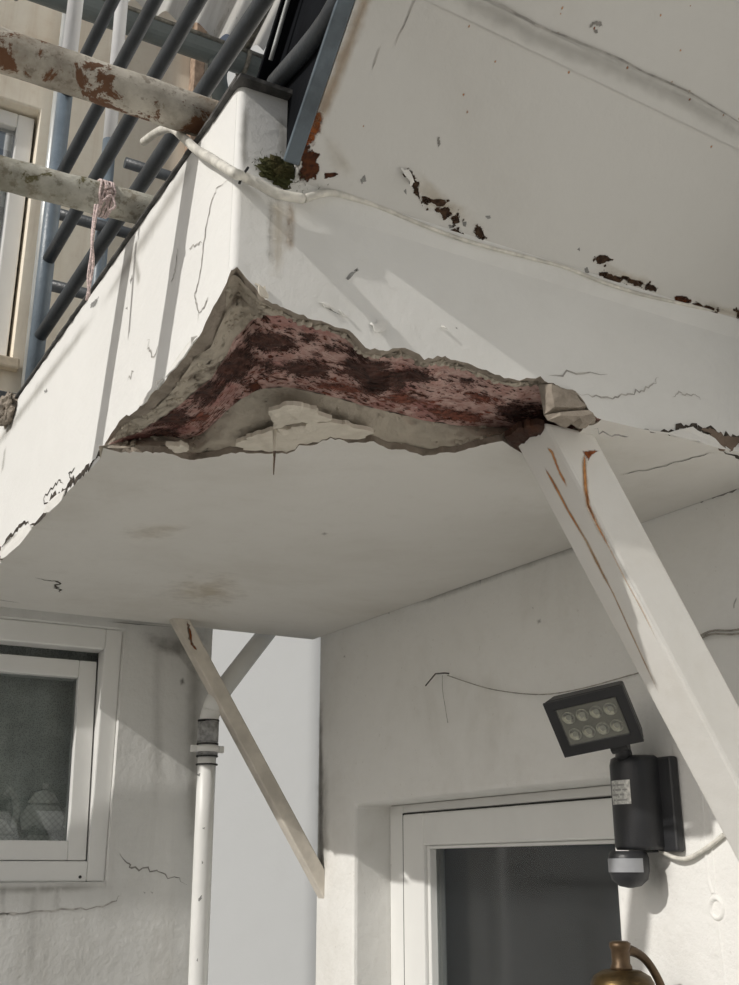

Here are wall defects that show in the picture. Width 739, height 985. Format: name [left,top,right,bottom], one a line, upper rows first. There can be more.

corrosion [298,112,338,182]
peeling [401,168,491,240]
crack [171,181,226,314]
peeling [585,255,657,292]
spalling [99,267,601,475]
crack [550,370,739,474]
corrosion [547,449,650,667]
crack [0,897,118,915]
crack [120,855,187,885]